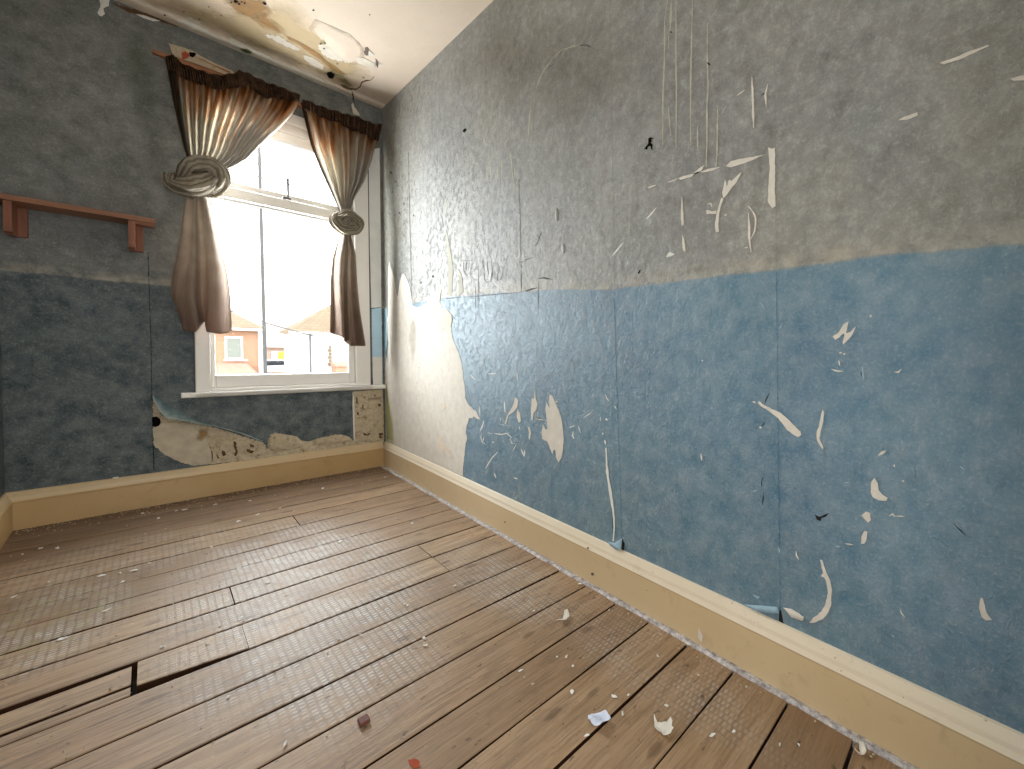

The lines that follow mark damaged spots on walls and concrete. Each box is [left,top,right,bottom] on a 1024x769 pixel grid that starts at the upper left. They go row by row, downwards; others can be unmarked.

peeling [169,17,383,98]
flaking render [152,389,384,466]